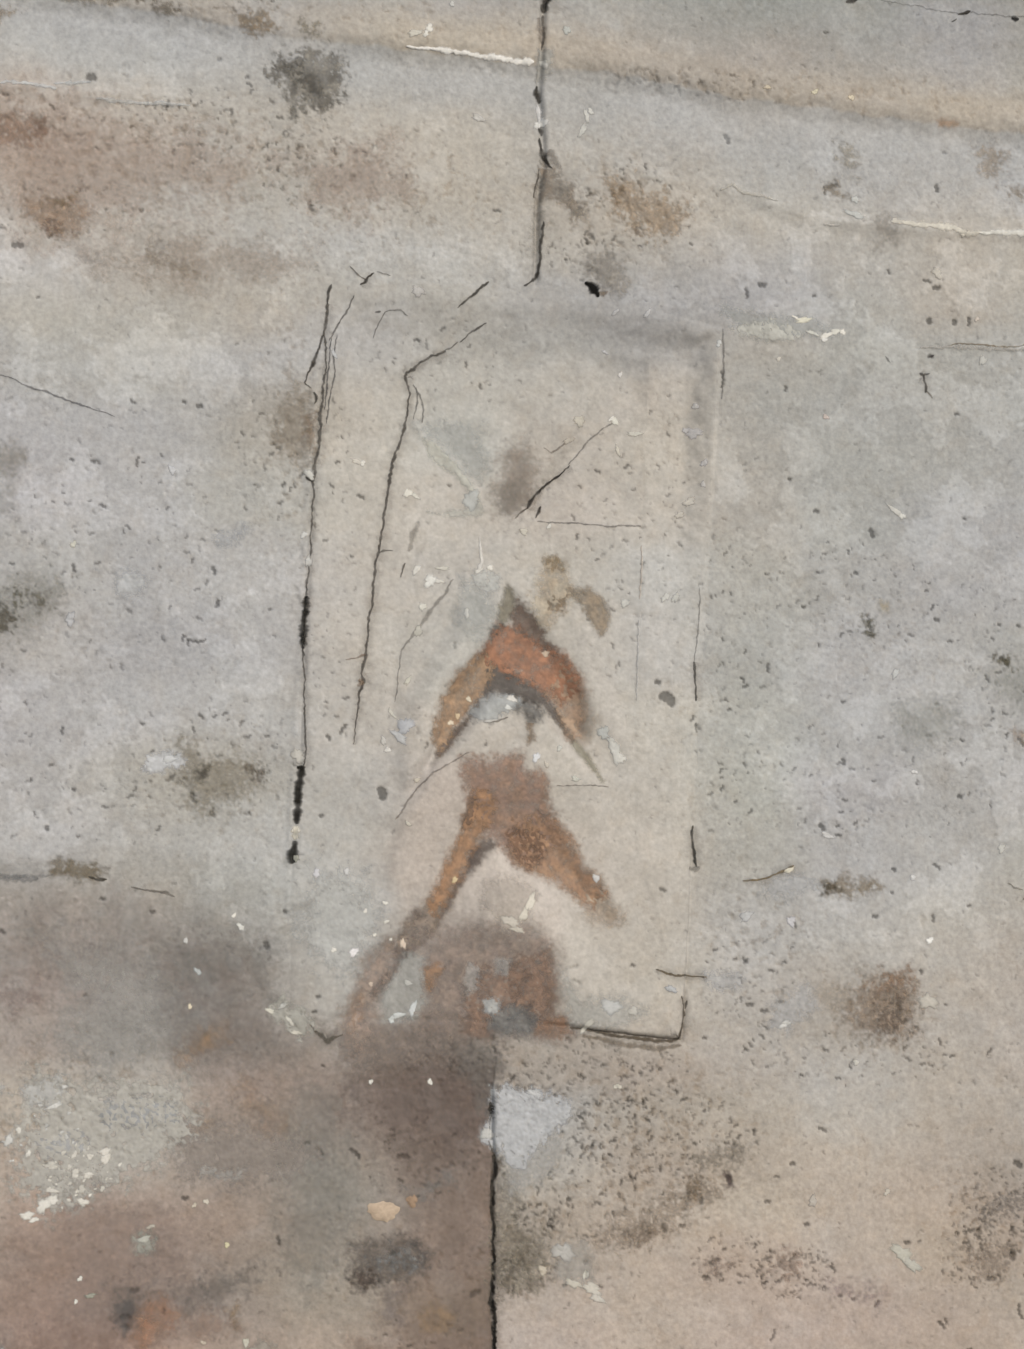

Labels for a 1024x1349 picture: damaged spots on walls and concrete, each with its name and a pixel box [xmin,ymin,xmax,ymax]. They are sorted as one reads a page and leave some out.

crack [538,0,551,50]
crack [524,86,557,286]
crack [287,266,408,864]
crack [353,281,489,744]
corrosion [535,557,609,636]
crack [518,423,640,527]
corrosion [432,626,584,752]
water stain [265,995,315,1042]
water stain [294,867,462,1024]
corrosion [398,754,617,1038]
water stain [131,1224,156,1255]
crack [488,1102,498,1349]